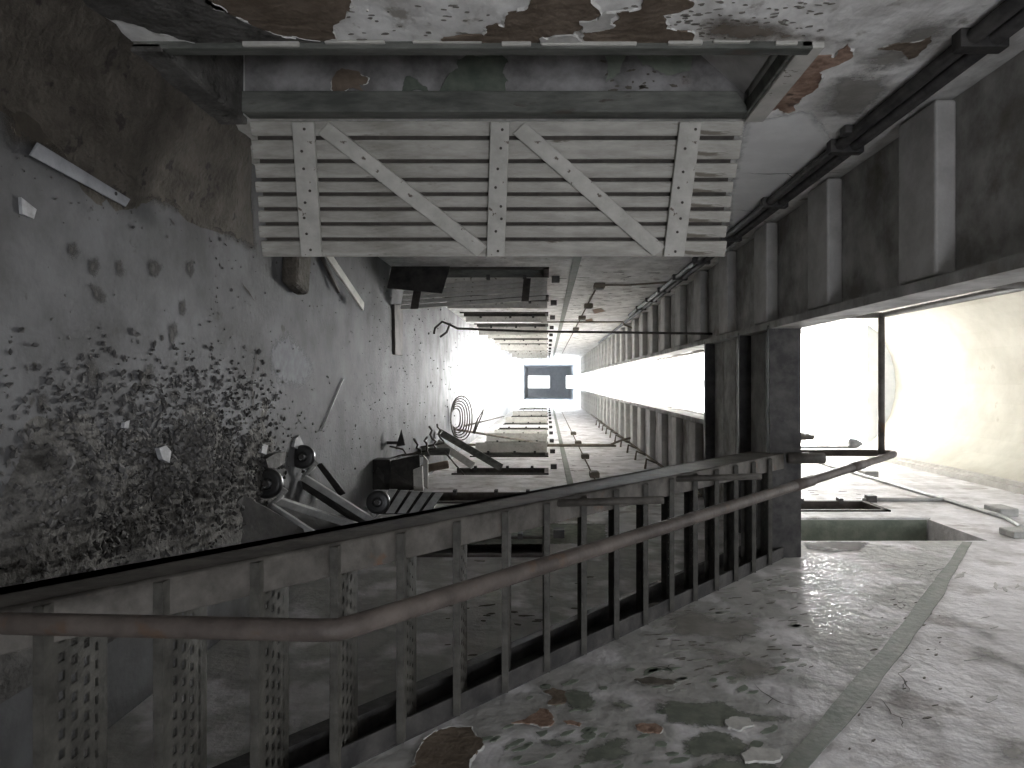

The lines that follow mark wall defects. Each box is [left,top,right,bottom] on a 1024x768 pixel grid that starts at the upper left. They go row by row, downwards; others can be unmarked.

spalling [83,0,402,43]
spalling [402,0,836,91]
spalling [771,45,855,115]
spalling [878,36,932,60]
water stain [796,541,868,634]
spalling [410,569,814,768]